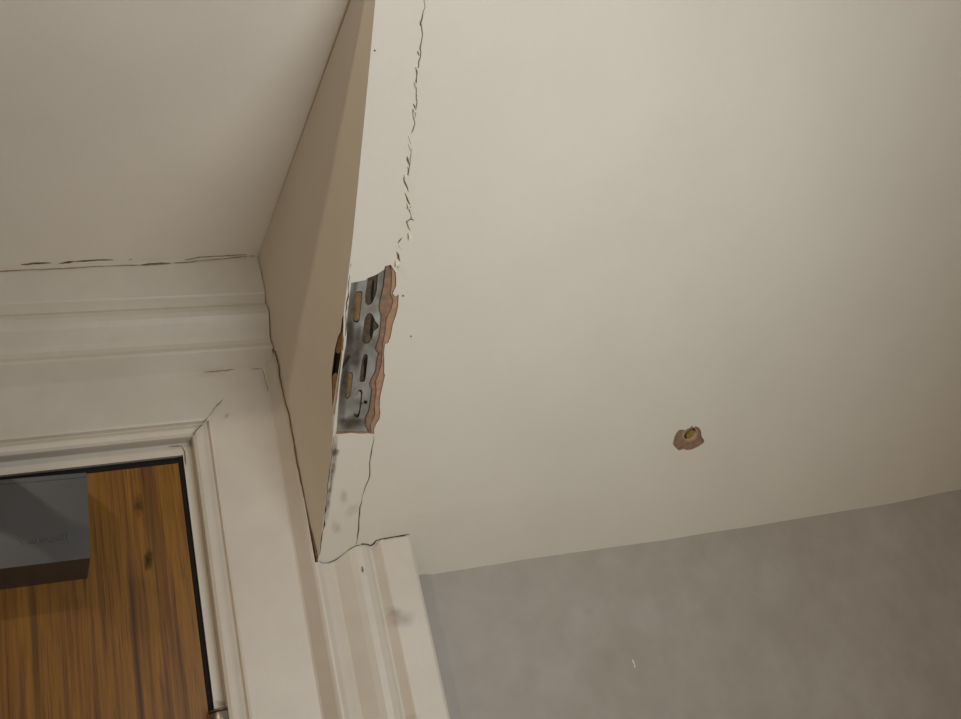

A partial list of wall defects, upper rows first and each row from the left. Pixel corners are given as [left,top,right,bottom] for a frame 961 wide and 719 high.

crack [395,2,425,269]
crack [0,254,247,272]
crack [169,401,222,463]
crack [204,349,410,563]
flaking render [331,265,399,434]
spalling [673,426,704,450]